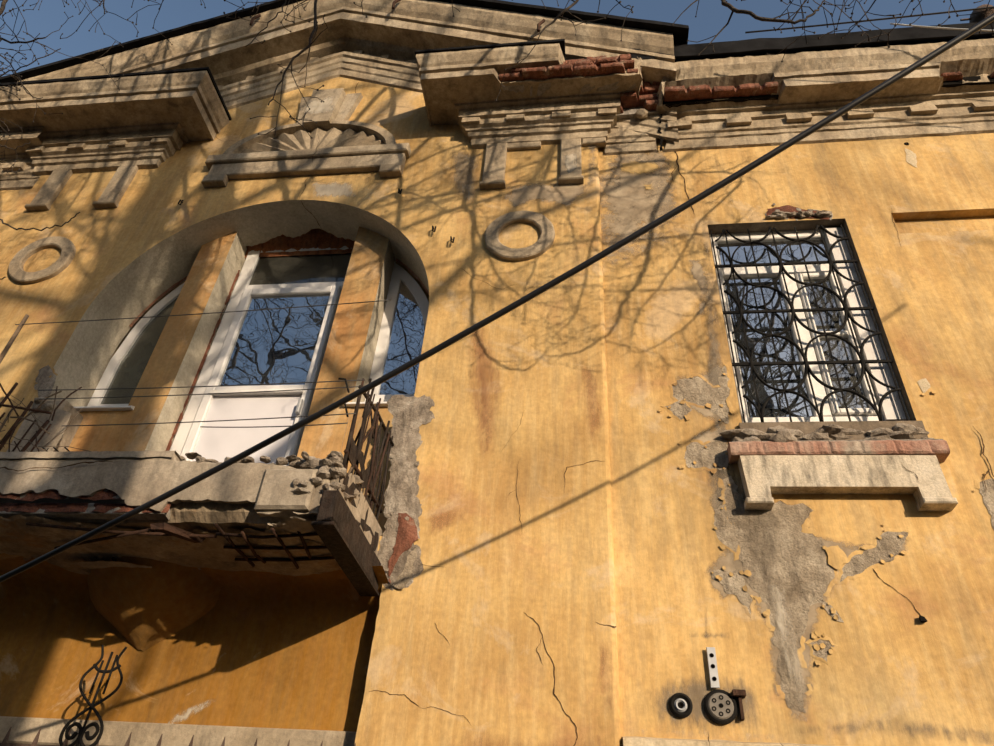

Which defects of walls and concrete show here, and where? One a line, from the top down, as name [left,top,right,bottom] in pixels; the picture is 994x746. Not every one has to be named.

flaking render [505,146,675,262]
crack [658,114,694,213]
spalling [166,270,364,502]
spalling [0,489,342,576]
flaking render [376,395,435,590]
flaking render [658,363,912,717]
crack [974,428,994,488]
crack [373,690,471,725]
crack [525,613,578,746]